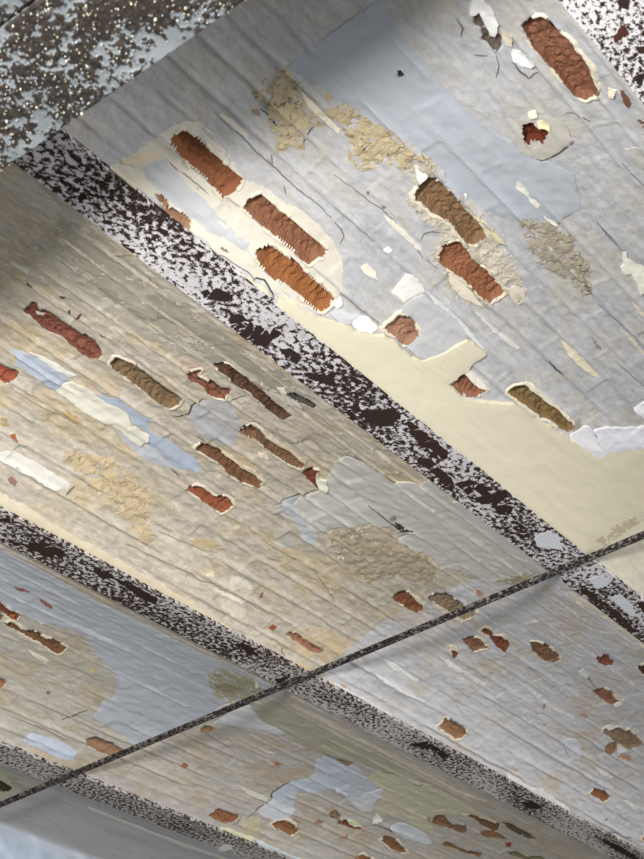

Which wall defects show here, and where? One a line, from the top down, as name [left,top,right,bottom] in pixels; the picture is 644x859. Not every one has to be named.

peeling [0,0,233,144]
flaking render [469,0,616,103]
peeling [252,0,592,309]
peeling [110,121,468,359]
peeling [0,347,69,391]
peeling [0,451,70,491]
peeling [24,303,547,622]
peeling [505,382,644,459]
peeling [534,530,563,550]
flaking render [530,640,563,663]
peeling [0,550,550,859]
flaking render [600,725,644,755]